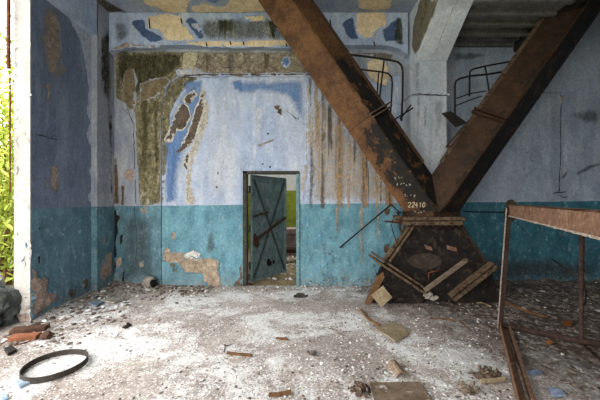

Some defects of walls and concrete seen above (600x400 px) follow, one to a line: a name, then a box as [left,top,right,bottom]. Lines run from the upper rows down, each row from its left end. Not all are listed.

peeling [111,0,290,51]
peeling [343,0,397,87]
peeling [12,108,35,168]
leakage [101,34,307,205]
peeling [164,56,311,205]
rust [306,79,393,241]
peeling [99,235,123,281]
peeling [161,231,221,286]
peeling [17,268,90,322]